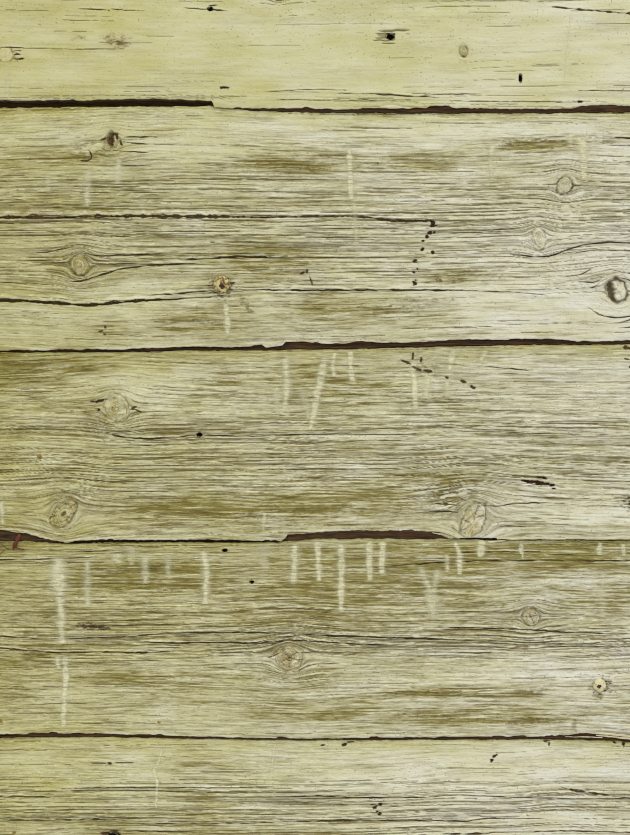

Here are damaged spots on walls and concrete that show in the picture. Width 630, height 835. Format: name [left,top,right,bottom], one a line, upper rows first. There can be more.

crack [72,253,268,282]
crack [0,290,212,307]
crack [260,286,453,294]
water stain [51,558,66,643]
water stain [202,552,210,604]
water stain [290,544,298,584]
water stain [314,542,322,581]
water stain [338,545,346,612]
water stain [366,542,386,580]
water stain [420,542,462,624]
water stain [55,657,69,727]